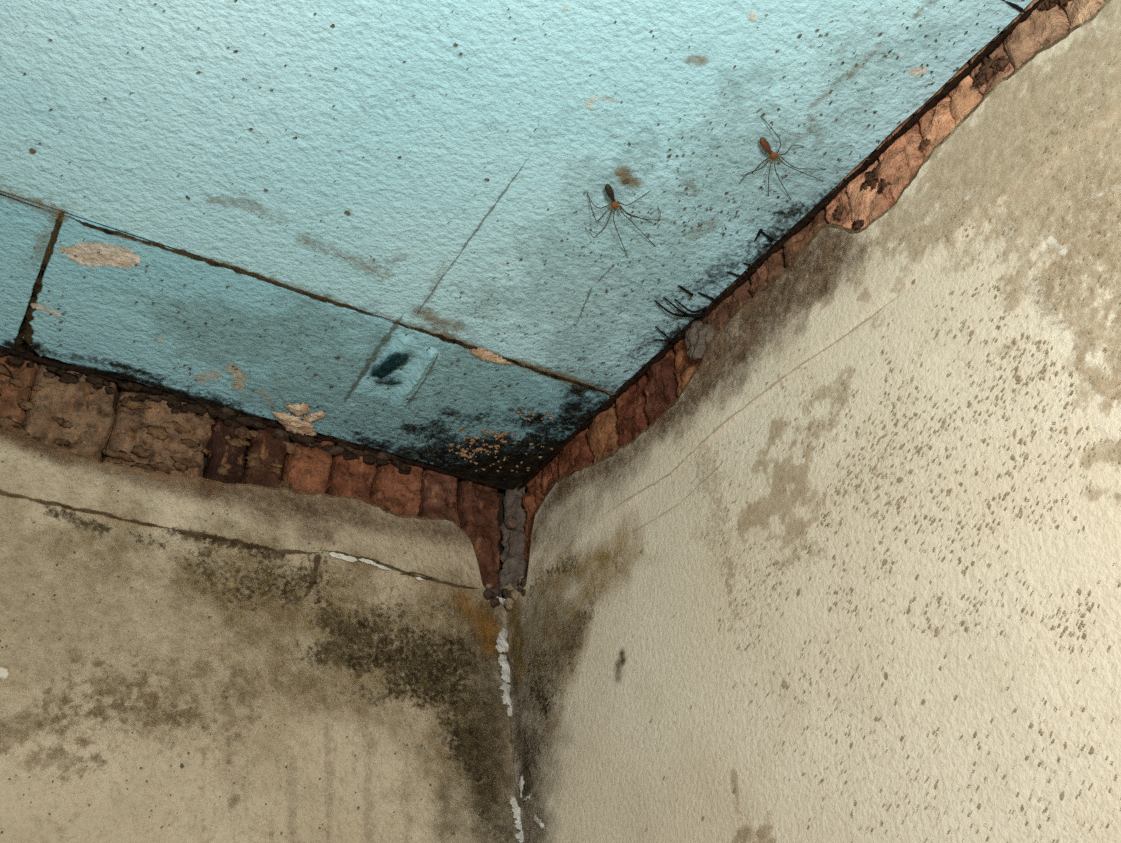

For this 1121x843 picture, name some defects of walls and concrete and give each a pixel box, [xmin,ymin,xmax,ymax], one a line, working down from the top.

crack [0,489,480,598]
leakage [0,429,621,843]
crack [0,0,1045,490]
spalling [0,0,1121,611]
leakage [304,82,838,489]
leakage [533,155,1121,843]
leakage [757,20,906,173]
leakage [896,5,1019,100]